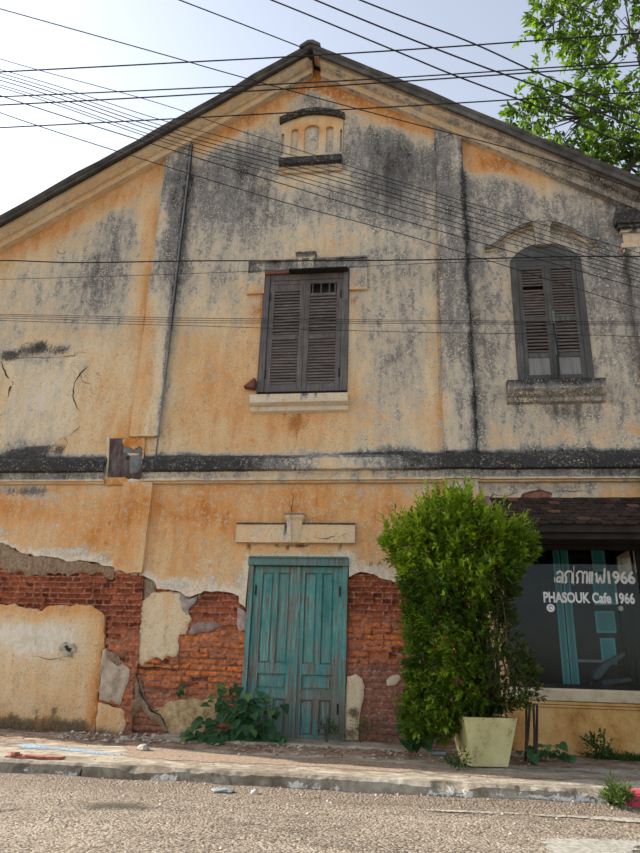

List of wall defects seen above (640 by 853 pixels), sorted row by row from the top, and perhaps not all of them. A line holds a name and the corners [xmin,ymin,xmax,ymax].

leakage [2,340,66,361]
crack [0,350,91,448]
flaking render [0,543,247,736]
flaking render [345,572,425,745]